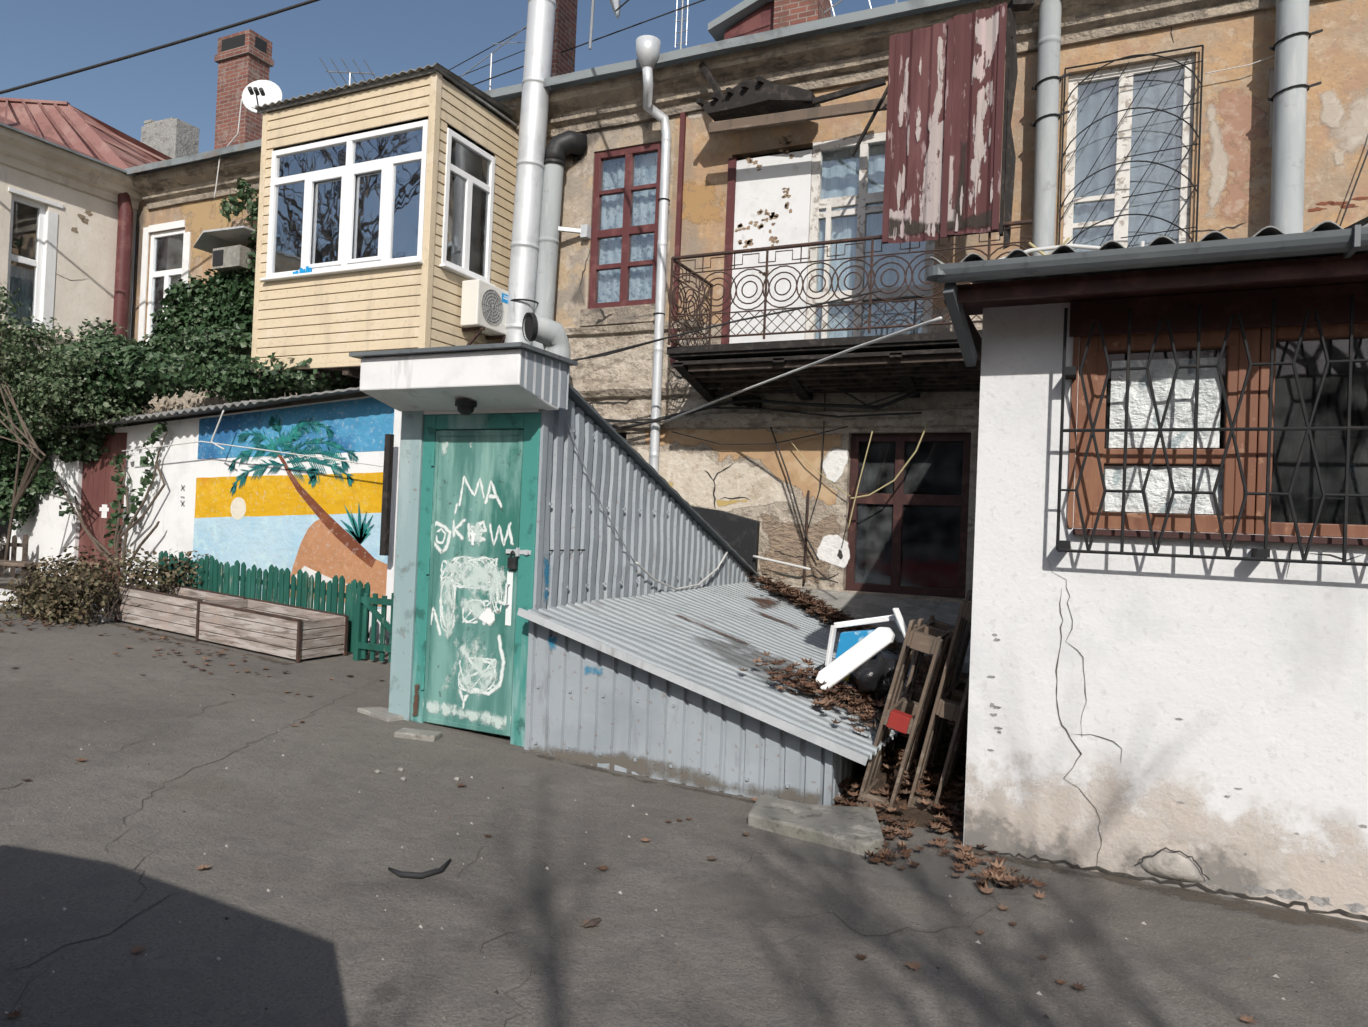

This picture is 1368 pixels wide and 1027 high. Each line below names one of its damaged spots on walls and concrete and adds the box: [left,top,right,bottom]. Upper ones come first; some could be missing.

peeling [888,12,1000,240]
flaking render [1320,90,1368,165]
flaking render [637,429,842,587]
crack [967,562,1368,920]
damp [964,811,1076,866]
damp [1123,852,1258,899]